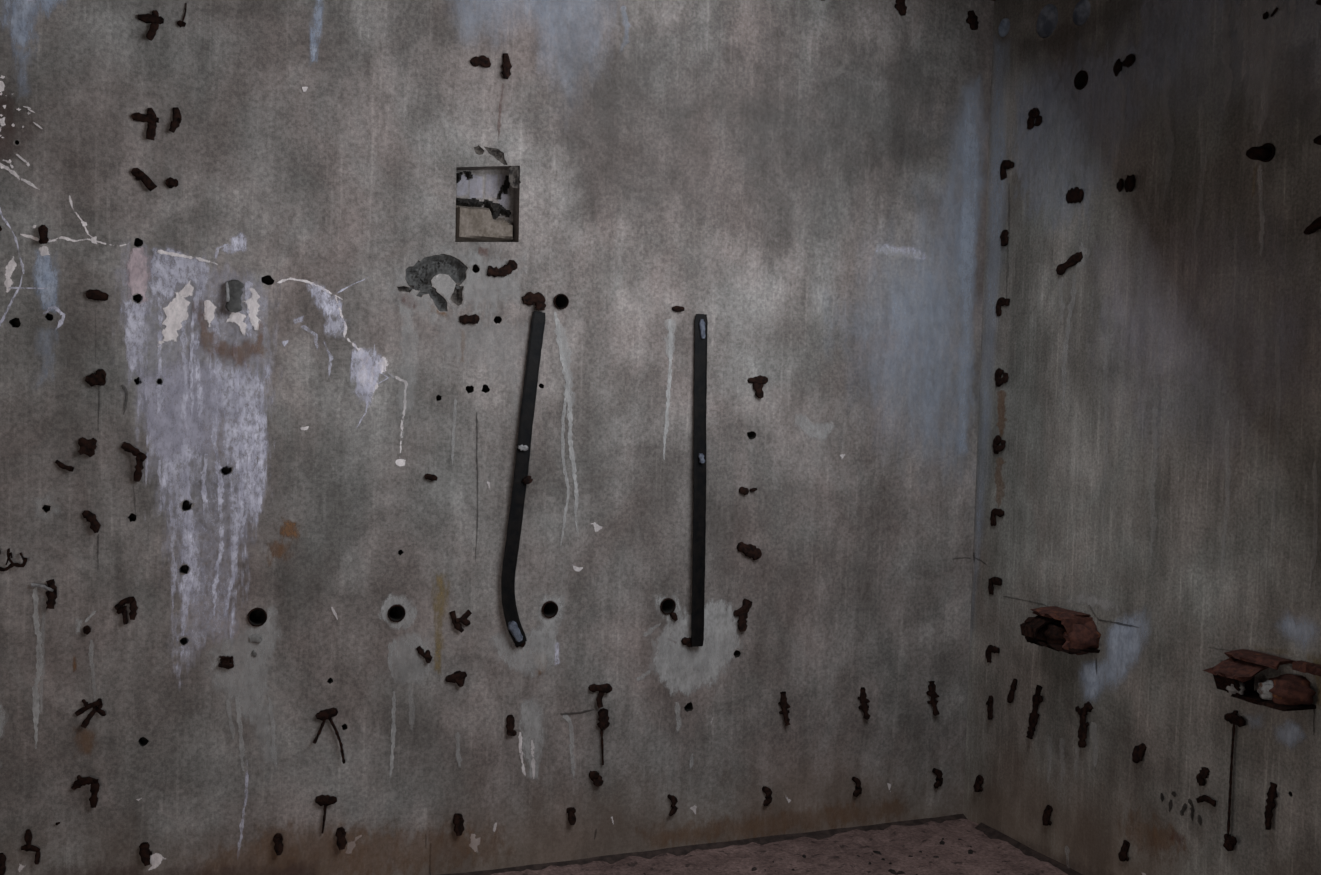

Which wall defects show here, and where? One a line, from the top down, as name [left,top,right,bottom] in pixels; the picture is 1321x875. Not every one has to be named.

crack [0,195,126,325]
crack [277,277,389,426]
leakage [121,233,270,636]